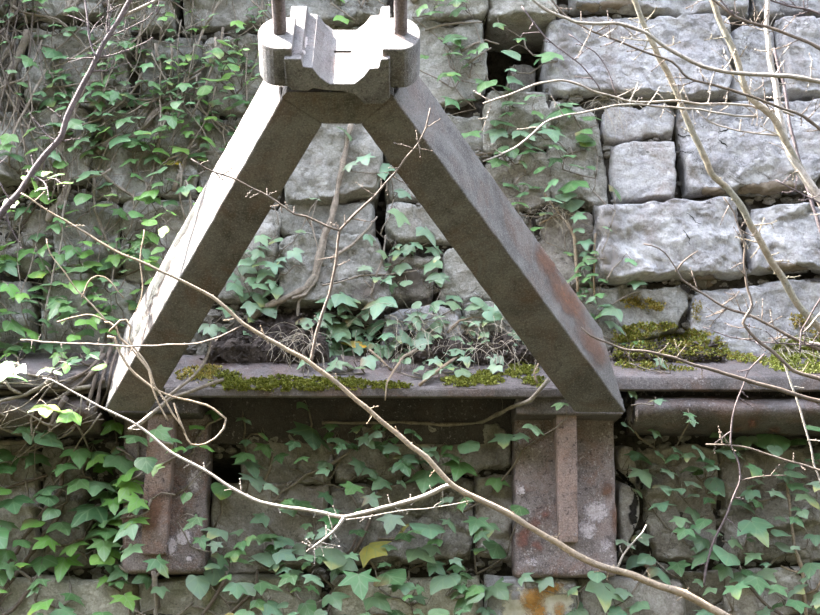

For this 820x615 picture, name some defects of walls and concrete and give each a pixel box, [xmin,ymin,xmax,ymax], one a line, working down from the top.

rust [521,585,564,615]